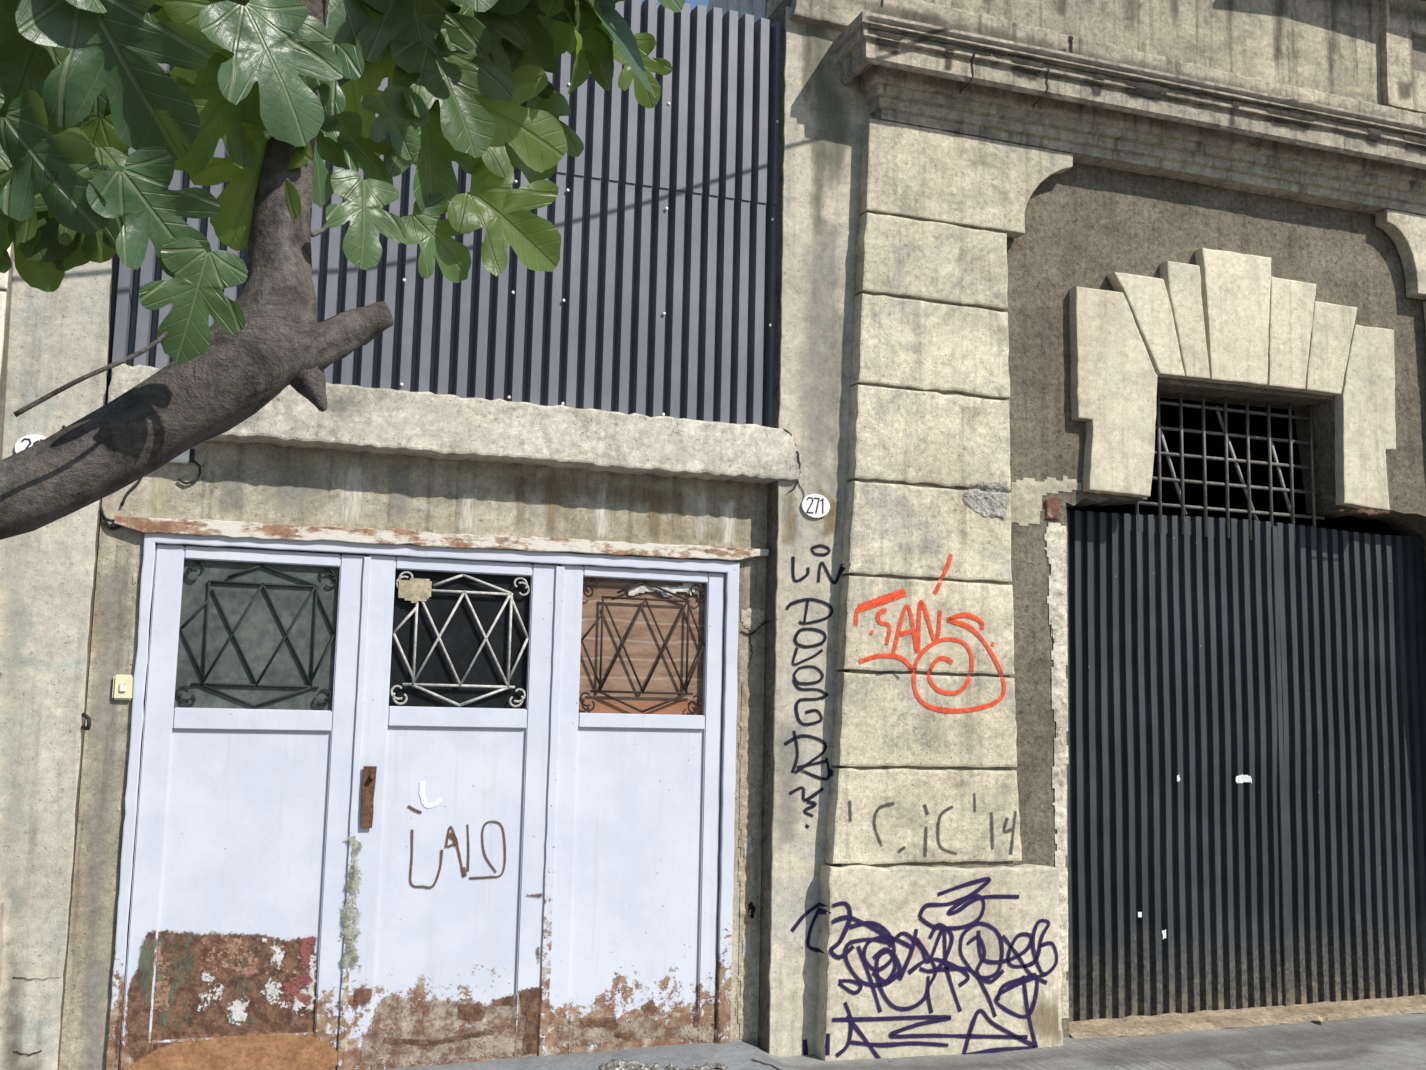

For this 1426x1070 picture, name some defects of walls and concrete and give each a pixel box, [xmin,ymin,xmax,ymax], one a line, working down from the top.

damp [874,6,1108,95]
damp [1276,0,1284,54]
damp [1126,61,1245,125]
damp [1265,104,1329,131]
damp [1400,82,1412,97]
rust [114,930,338,1070]
rust [353,980,737,1068]